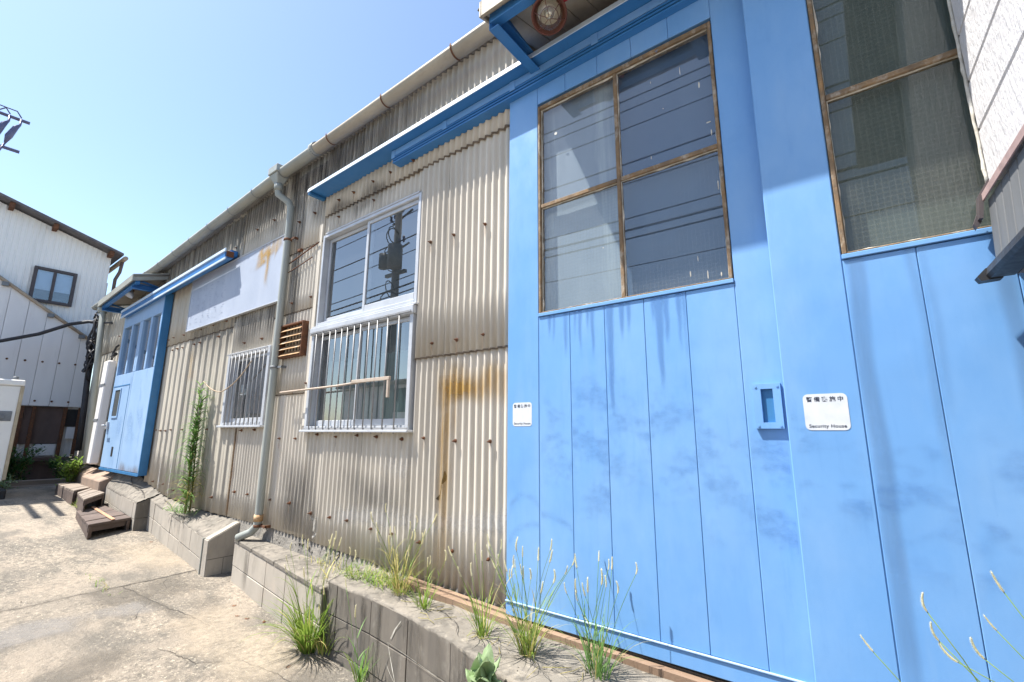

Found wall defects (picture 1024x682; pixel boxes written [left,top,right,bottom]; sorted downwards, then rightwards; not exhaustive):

corrosion [445,380,483,397]
crack [1,570,208,625]